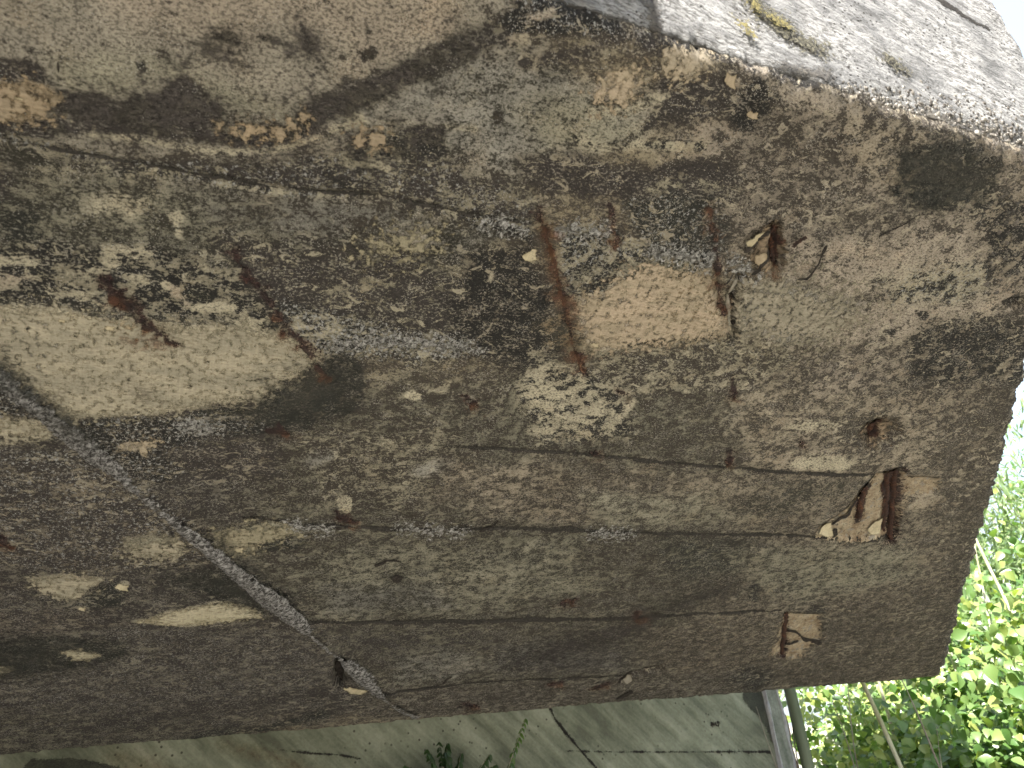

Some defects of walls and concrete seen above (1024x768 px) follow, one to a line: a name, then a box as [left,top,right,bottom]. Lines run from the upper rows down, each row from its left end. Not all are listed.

corrosion [84,274,181,349]
corrosion [529,204,588,377]
corrosion [704,200,729,316]
peeling [565,215,892,366]
spalling [815,465,942,548]
crack [374,560,403,583]
spalling [768,612,827,662]